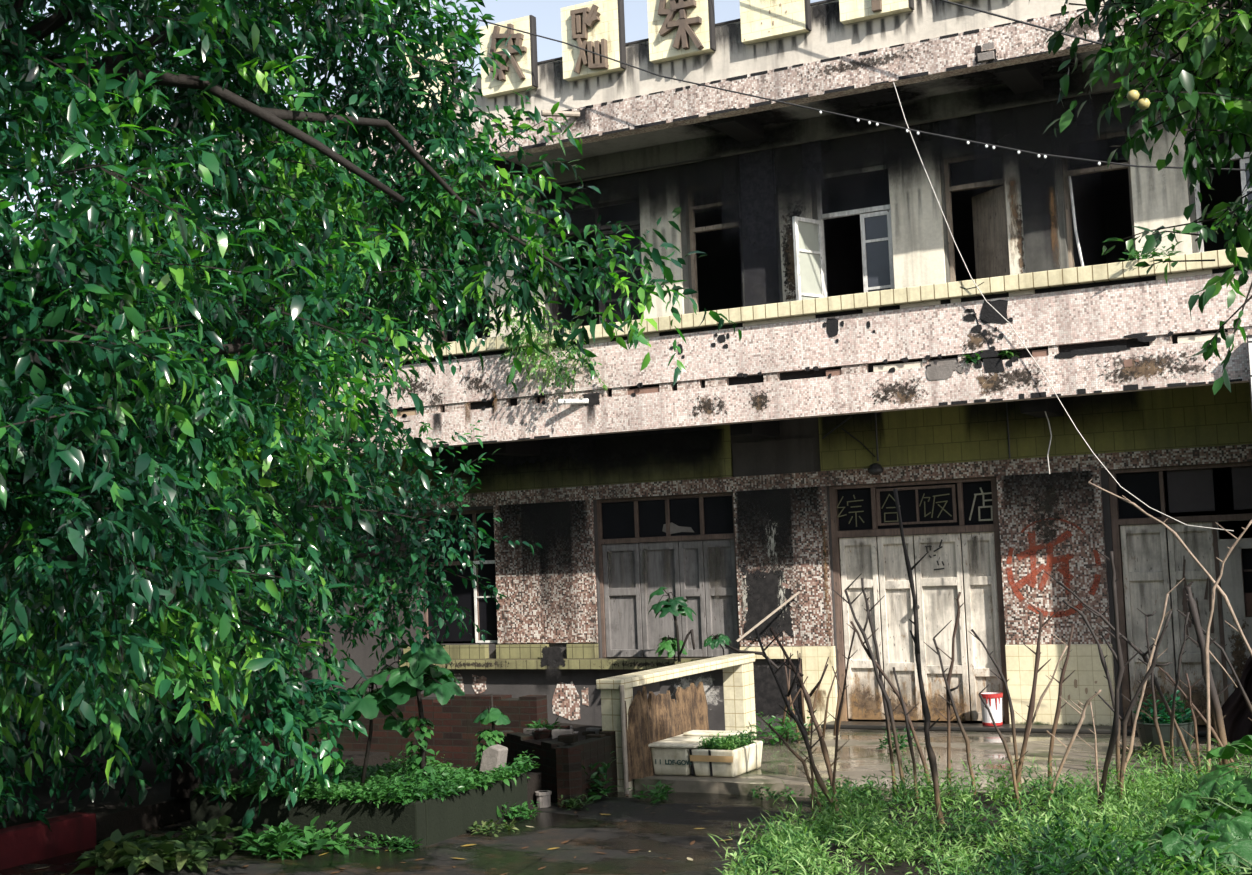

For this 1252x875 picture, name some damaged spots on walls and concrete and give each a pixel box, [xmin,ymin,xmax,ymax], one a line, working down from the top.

water stain [494,23,741,105]
water stain [754,0,1006,56]
water stain [535,11,1184,307]
spalling [823,318,844,343]
spalling [925,300,1019,380]
water stain [431,392,727,488]
water stain [822,377,928,436]
water stain [967,363,1049,427]
water stain [1063,347,1215,420]
water stain [499,500,586,576]
water stain [736,487,820,618]
spalling [739,563,795,641]